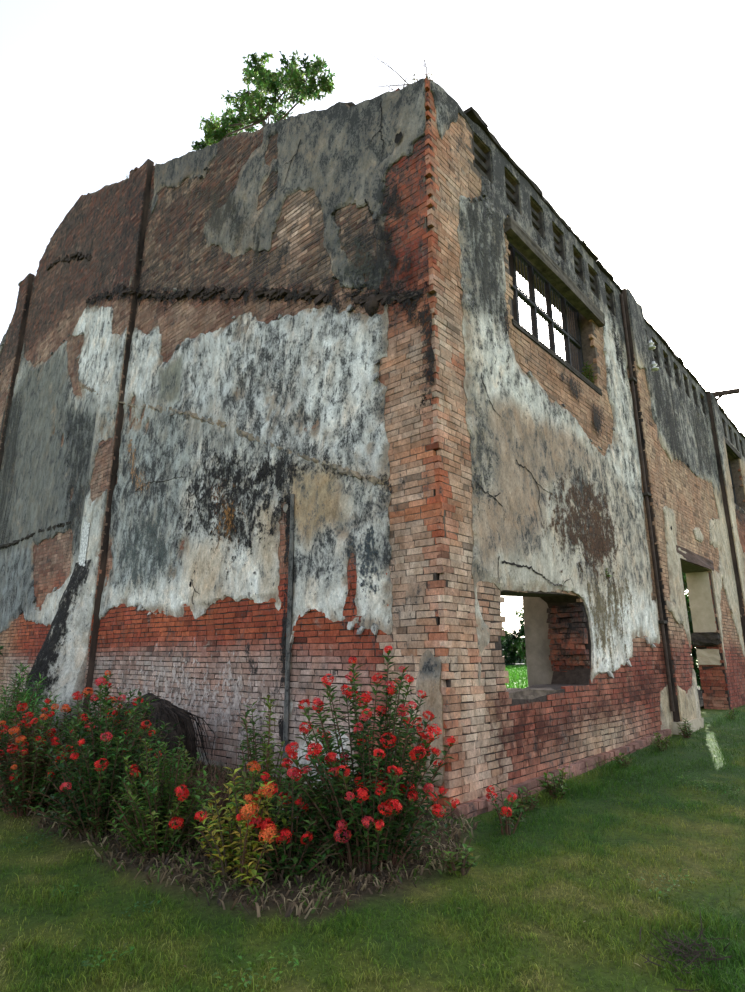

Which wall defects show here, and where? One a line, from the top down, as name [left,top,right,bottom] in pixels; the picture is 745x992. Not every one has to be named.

damp [172,432,277,586]
flaking render [0,78,719,817]
crack [516,460,553,520]
crack [498,556,575,592]
damp [484,460,662,782]
damp [642,345,712,480]
flaking render [715,584,745,709]
flaking render [735,500,745,552]